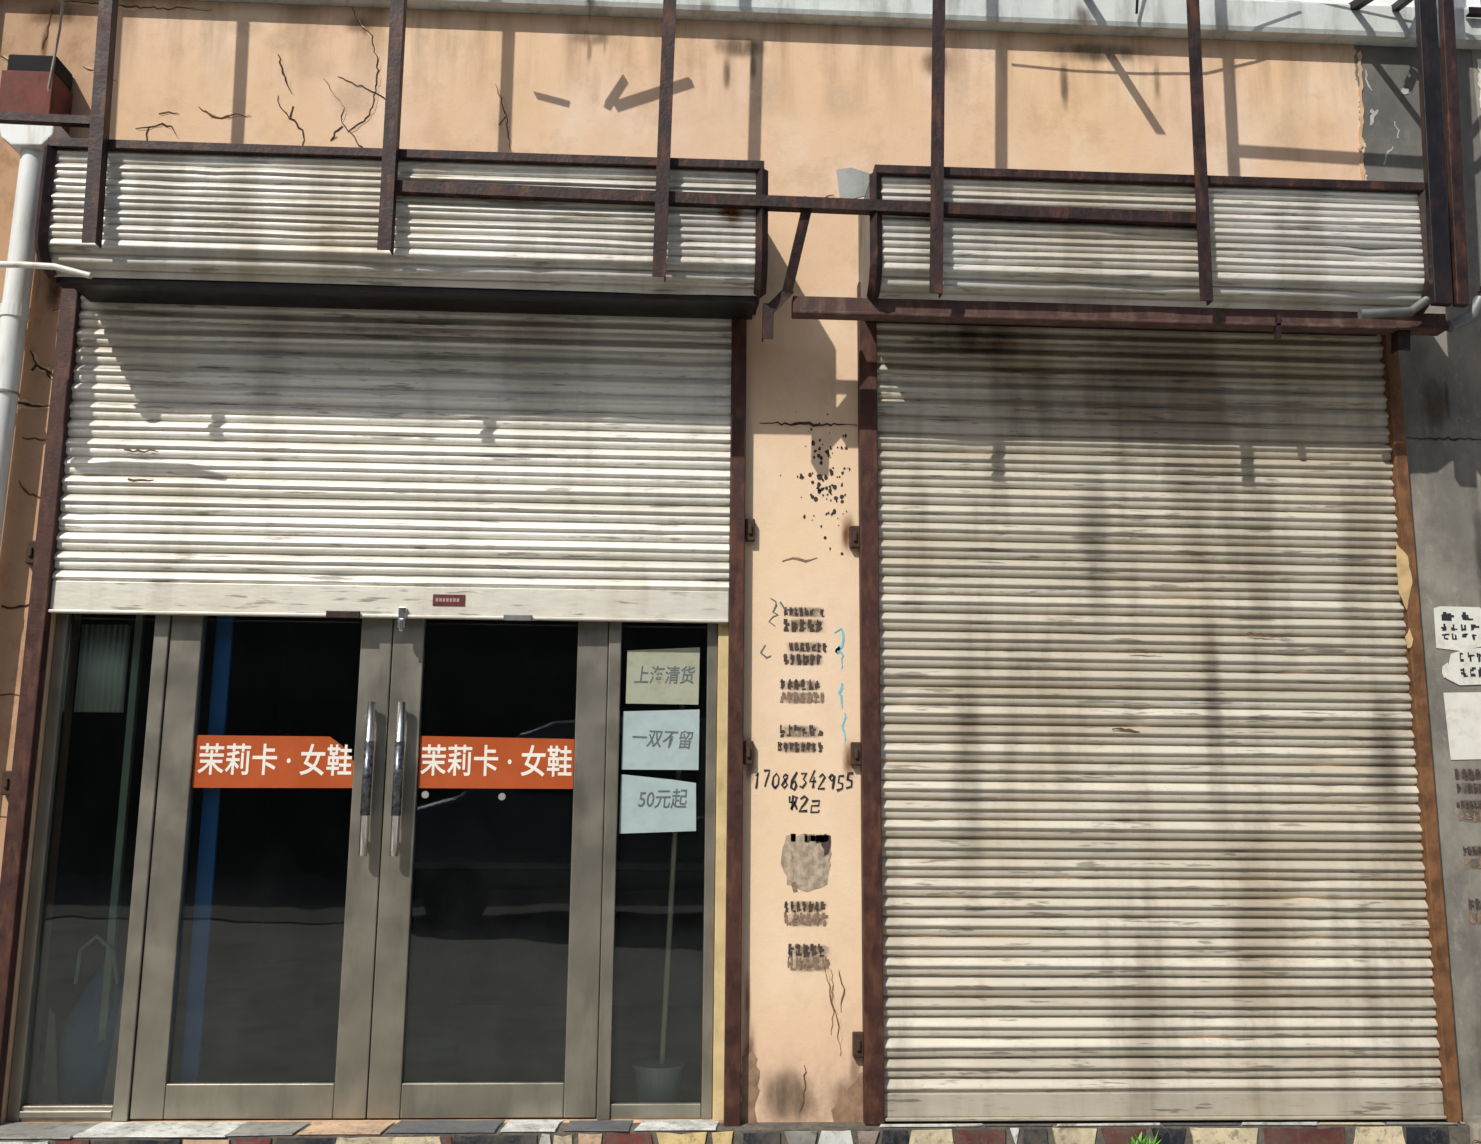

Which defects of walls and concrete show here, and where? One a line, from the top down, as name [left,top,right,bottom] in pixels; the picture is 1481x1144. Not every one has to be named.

crack [42,0,213,49]
crack [135,6,385,148]
leakage [726,41,756,82]
crack [495,84,513,153]
spalling [1357,51,1379,180]
corrosion [723,208,740,220]
crack [760,420,858,428]
crack [1,602,29,610]